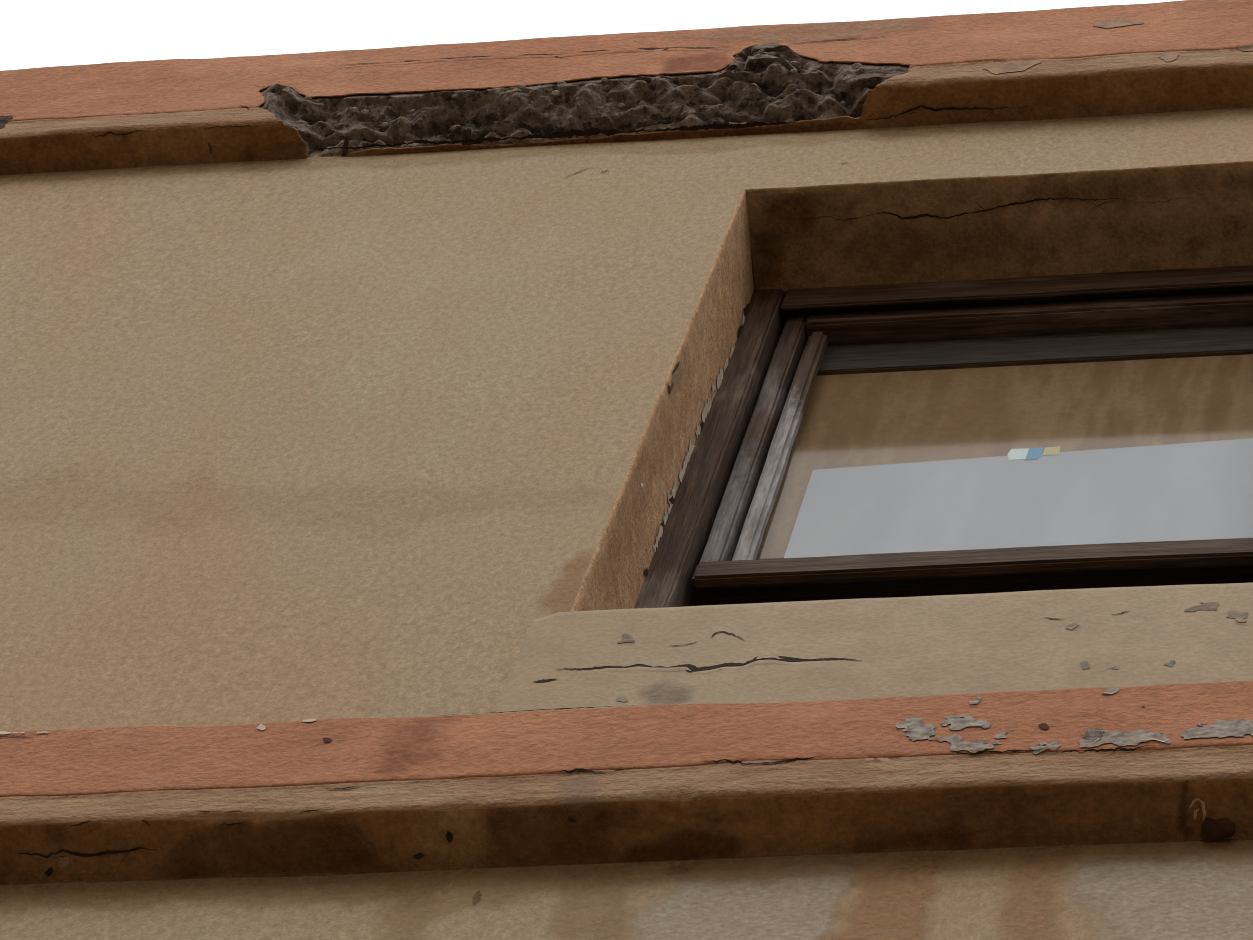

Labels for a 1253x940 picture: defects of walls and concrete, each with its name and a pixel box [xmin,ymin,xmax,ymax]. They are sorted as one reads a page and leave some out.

spalling [240,42,909,158]
crack [787,197,1185,221]
peeling [1184,602,1249,622]
crack [534,631,862,682]
crack [553,766,635,774]
crack [702,756,820,764]
peeling [896,697,1013,755]
peeling [1029,723,1061,754]
crack [956,745,1176,755]
peeling [1079,719,1253,747]
damp [634,857,852,940]
damp [1076,853,1253,940]